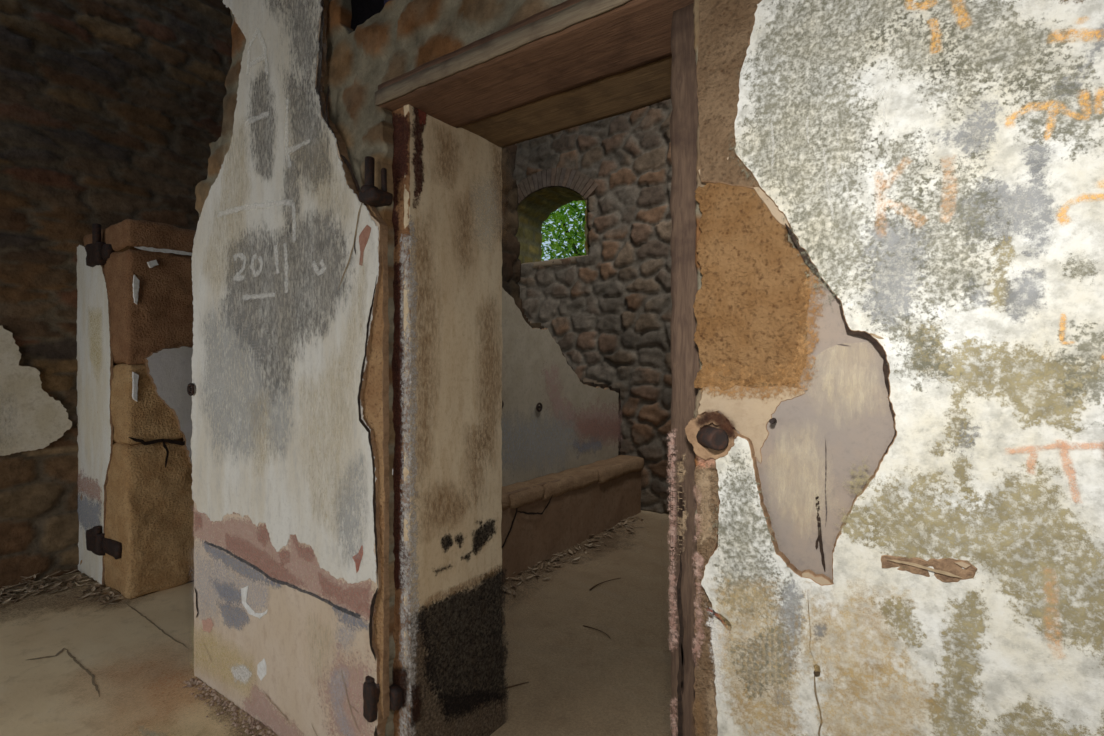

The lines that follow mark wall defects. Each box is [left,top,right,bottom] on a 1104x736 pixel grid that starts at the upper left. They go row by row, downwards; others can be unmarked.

spalling [132,275,140,305]
spalling [132,346,193,465]
spalling [693,169,895,585]
crack [128,437,185,468]
peeling [77,475,102,534]
crack [501,496,552,548]
crack [815,439,827,571]
spalling [881,555,977,582]
crack [808,602,822,736]